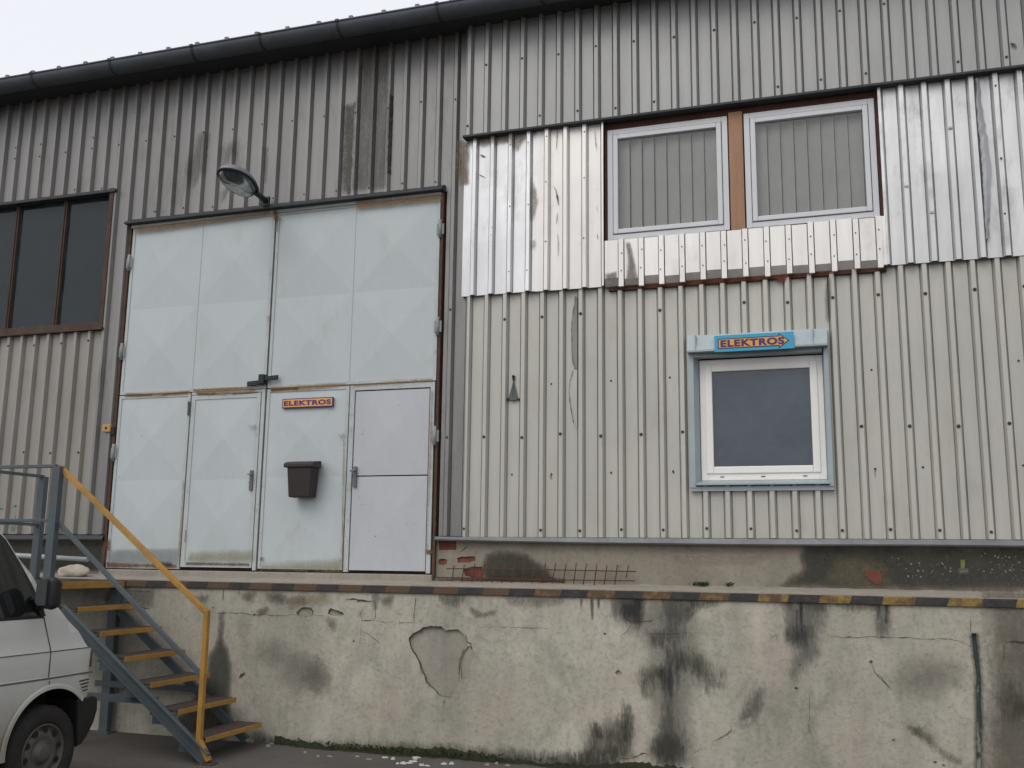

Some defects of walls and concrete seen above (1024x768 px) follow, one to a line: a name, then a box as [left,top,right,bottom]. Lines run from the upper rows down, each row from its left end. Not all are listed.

damp [342,45,394,193]
flaking render [438,541,483,578]
damp [786,548,1024,596]
flaking render [409,626,475,698]
damp [614,599,640,621]
damp [643,600,713,763]
crack [829,620,971,645]
damp [992,608,1024,768]